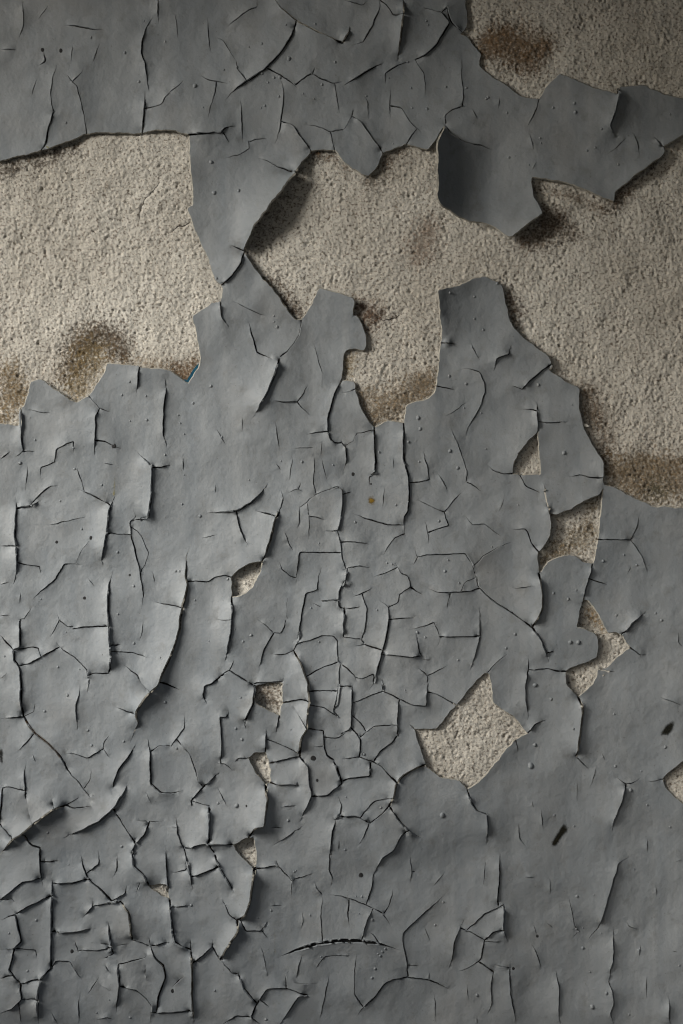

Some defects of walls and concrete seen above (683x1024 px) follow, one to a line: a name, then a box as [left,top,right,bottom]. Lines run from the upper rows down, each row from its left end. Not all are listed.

crack [33,25,98,151]
crack [141,0,178,132]
crack [189,0,462,172]
crack [445,63,484,147]
damp [477,18,561,81]
damp [54,316,134,400]
peeling [0,0,683,741]
damp [582,383,683,506]
crack [0,246,566,1024]
peeling [210,752,271,867]
peeling [377,673,526,845]